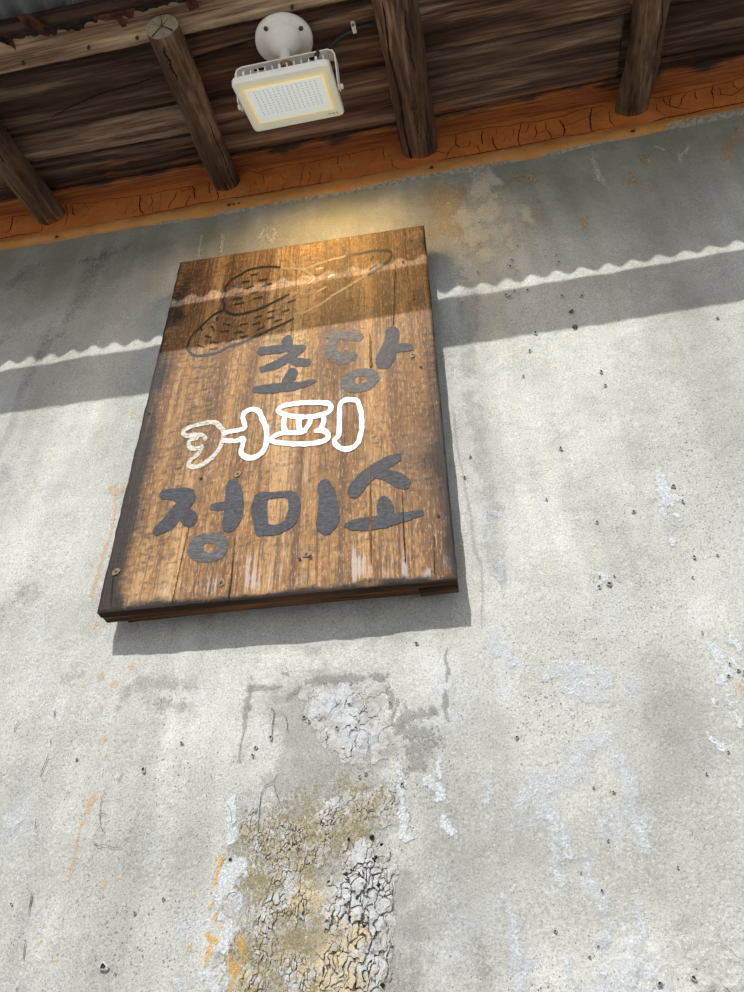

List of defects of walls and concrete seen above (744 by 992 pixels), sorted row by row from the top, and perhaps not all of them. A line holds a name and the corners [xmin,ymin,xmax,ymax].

crack [649,77,744,122]
crack [437,105,615,161]
crack [0,148,399,239]
crack [258,772,295,834]
corrosion [204,855,248,992]